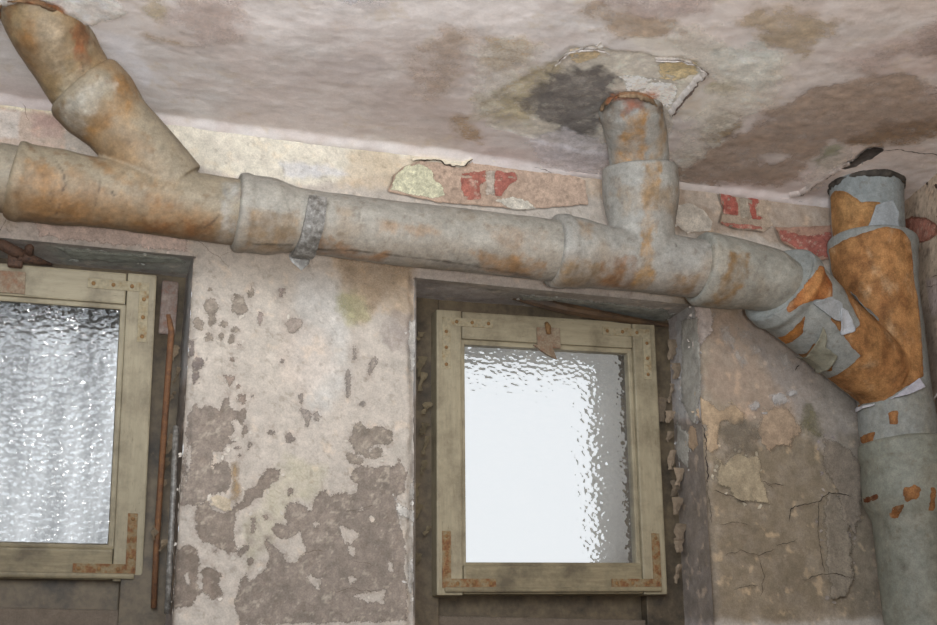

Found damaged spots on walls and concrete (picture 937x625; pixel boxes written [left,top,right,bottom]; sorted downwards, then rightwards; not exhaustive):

leakage [418,28,618,174]
leakage [583,0,937,189]
flaking render [388,161,588,210]
crack [789,162,851,198]
peeling [171,287,415,625]
crack [699,420,747,525]
flaking render [674,306,802,509]
crack [727,492,850,596]